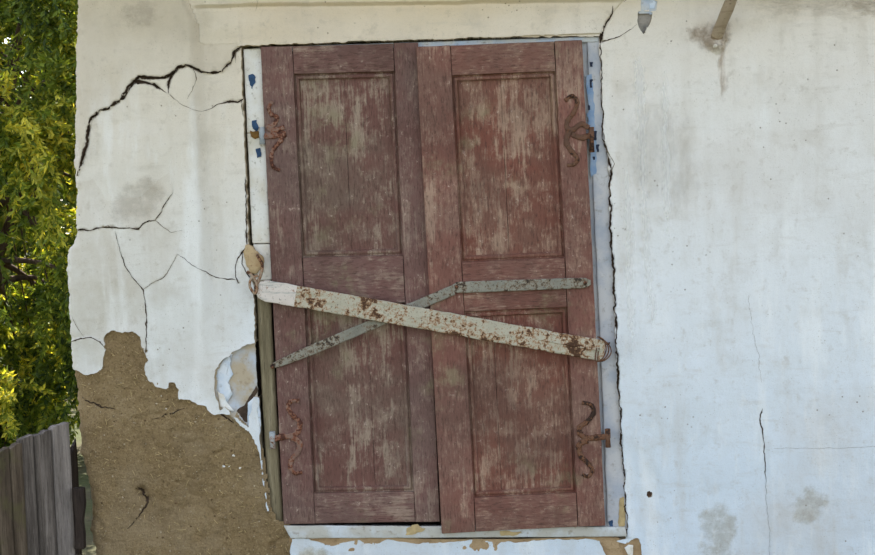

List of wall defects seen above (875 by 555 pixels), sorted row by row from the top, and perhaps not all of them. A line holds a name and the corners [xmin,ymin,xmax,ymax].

crack [77,47,246,176]
crack [78,178,253,353]
spalling [75,330,292,555]
spalling [601,537,642,555]
crack [759,409,871,554]